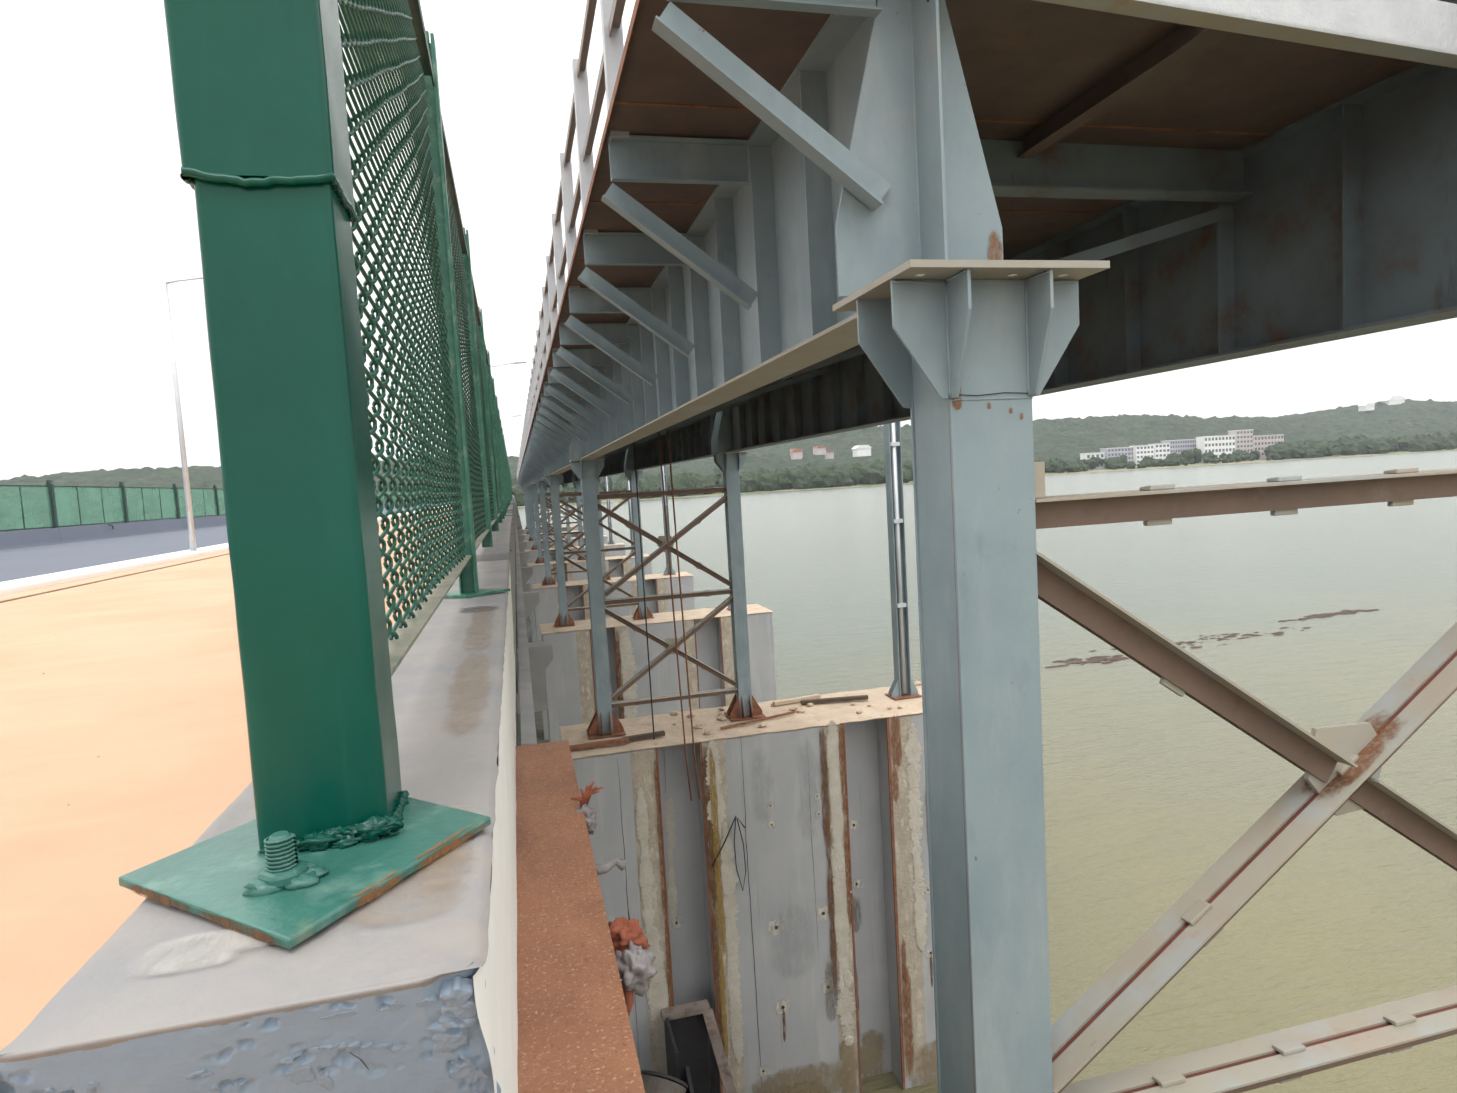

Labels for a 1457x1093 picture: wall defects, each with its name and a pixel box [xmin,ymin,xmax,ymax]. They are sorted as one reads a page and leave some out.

corrosion [989,232,1002,260]
corrosion [891,717,902,801]
corrosion [1208,652,1457,904]
corrosion [654,761,674,1007]
corrosion [820,727,852,993]
spalling [427,976,478,1053]
corrosion [902,939,914,1074]
corrosion [1052,923,1190,1063]